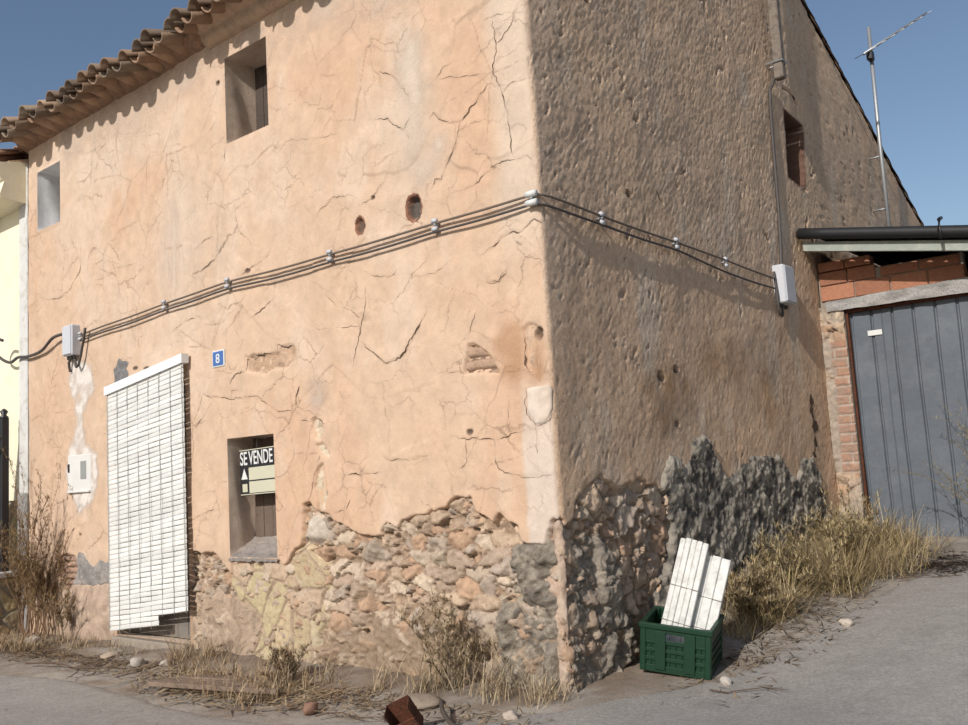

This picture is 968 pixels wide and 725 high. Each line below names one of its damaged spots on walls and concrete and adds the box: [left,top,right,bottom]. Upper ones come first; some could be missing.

crack [379,12,518,185]
crack [196,344,325,424]
spalling [248,345,297,374]
crack [314,294,425,397]
spalling [466,345,500,373]
crack [456,340,551,478]
spalling [189,420,575,685]